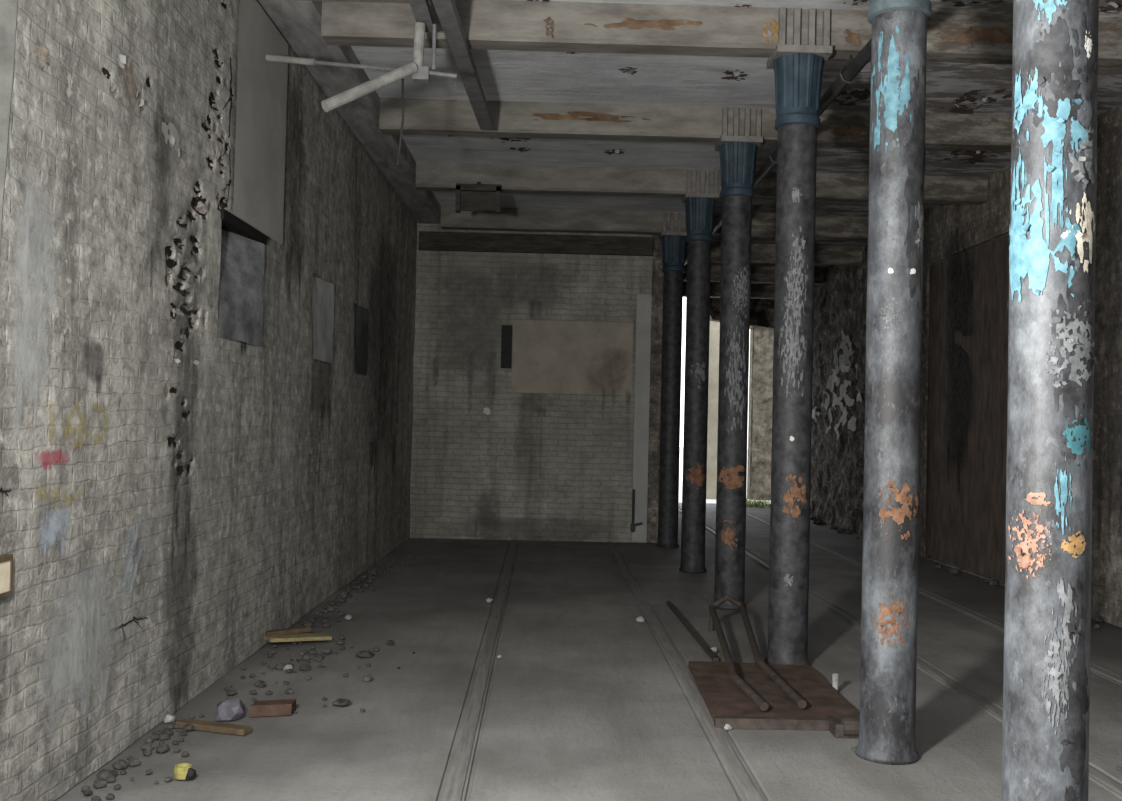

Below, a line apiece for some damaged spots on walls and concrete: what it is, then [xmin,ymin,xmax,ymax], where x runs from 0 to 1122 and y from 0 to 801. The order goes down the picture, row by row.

spalling [162,122,181,157]
spalling [202,48,234,174]
peeling [832,10,997,334]
spalling [164,181,228,365]
peeling [939,0,1122,535]
spalling [812,329,862,443]
spalling [167,433,194,475]
rust [686,463,744,489]
rust [780,474,807,522]
rust [878,480,918,540]
rust [1008,492,1086,579]
rust [872,592,909,648]